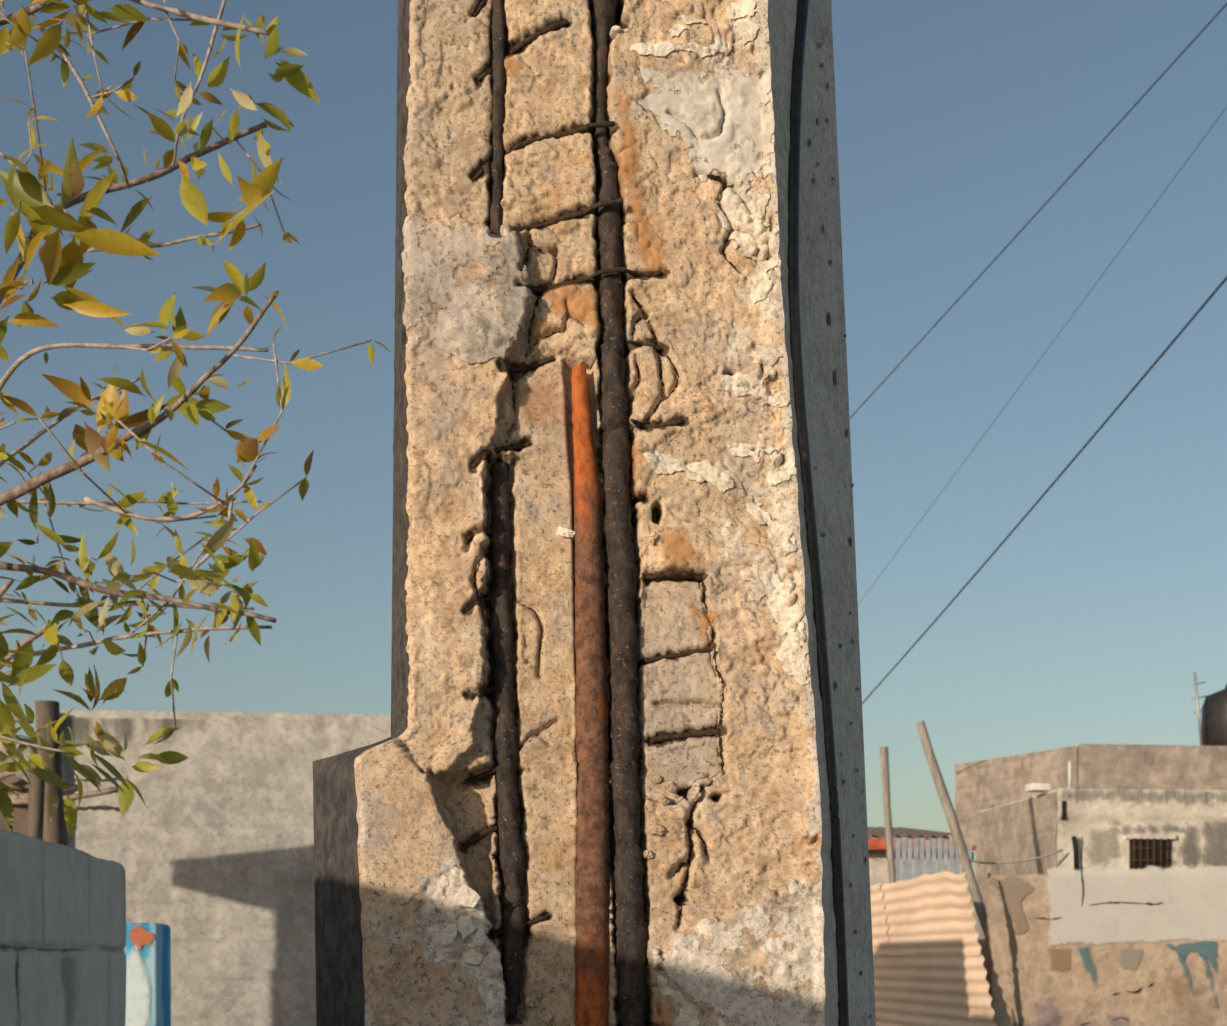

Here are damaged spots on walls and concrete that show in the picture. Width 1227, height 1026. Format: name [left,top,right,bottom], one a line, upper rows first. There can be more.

rust [474,16,529,89]
rust [470,133,541,196]
crack [697,174,732,210]
crack [723,238,740,273]
rust [623,338,669,357]
spalling [403,0,826,1026]
rust [627,403,689,542]
rust [463,436,532,741]
rust [637,725,727,782]
crack [673,581,724,929]
crack [998,838,1165,1026]
crack [0,945,84,1026]